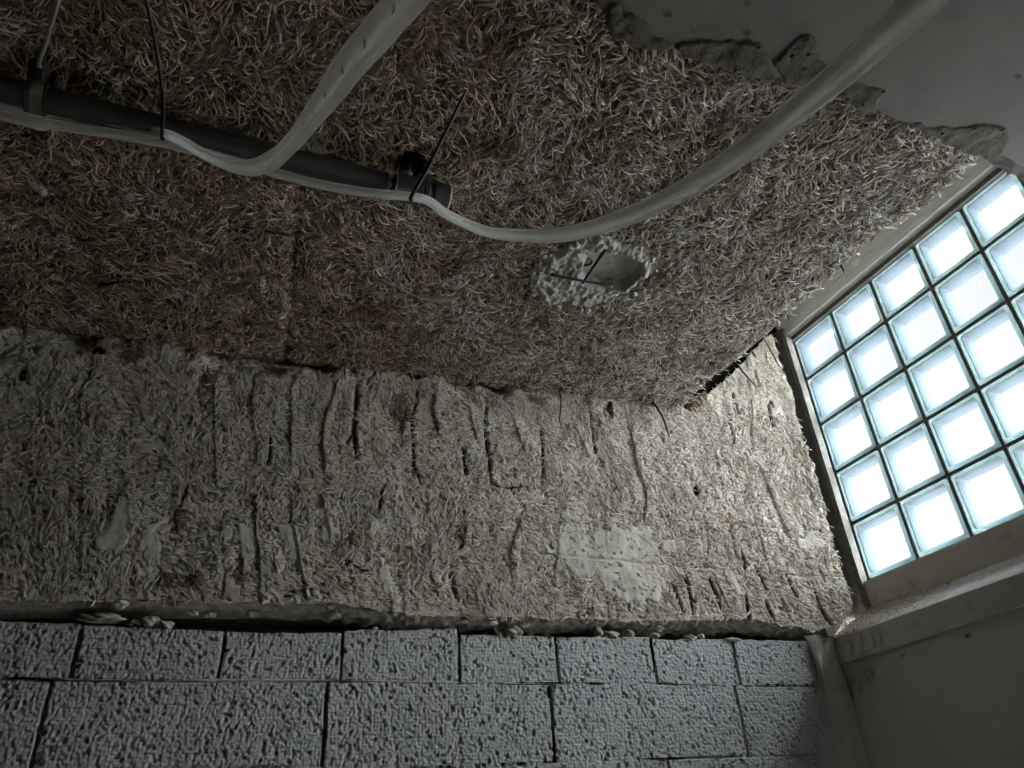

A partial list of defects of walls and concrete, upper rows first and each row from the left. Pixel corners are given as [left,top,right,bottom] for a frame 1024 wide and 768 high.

peeling [605,2,828,88]
peeling [837,83,1024,181]
spalling [529,233,658,314]
crack [346,385,358,459]
crack [410,393,420,482]
crack [462,408,519,491]
crack [538,430,546,479]
crack [345,559,365,577]
crack [448,575,456,599]